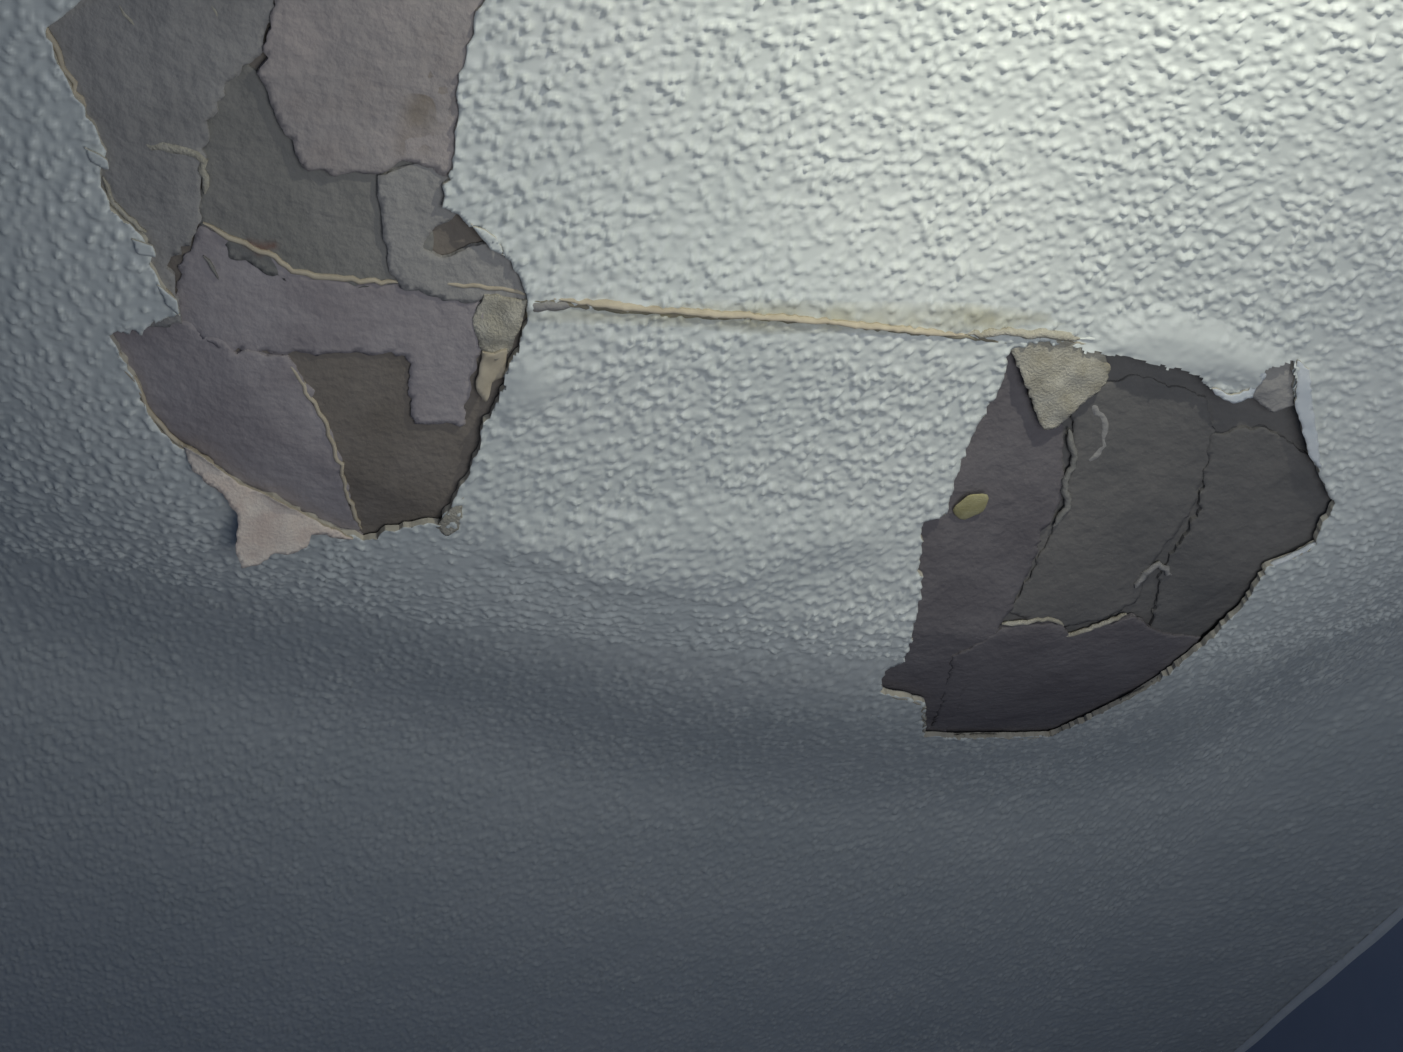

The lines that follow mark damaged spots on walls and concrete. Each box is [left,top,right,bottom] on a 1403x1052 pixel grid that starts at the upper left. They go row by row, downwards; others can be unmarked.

peeling [46,0,527,568]
crack [533,298,1102,343]
peeling [882,338,1332,740]